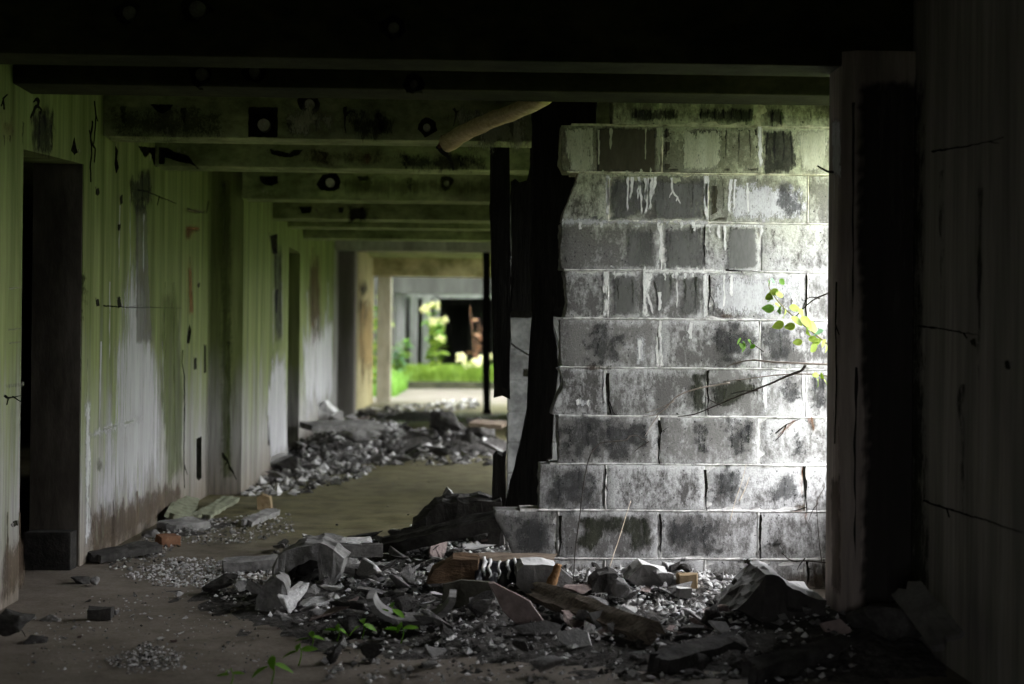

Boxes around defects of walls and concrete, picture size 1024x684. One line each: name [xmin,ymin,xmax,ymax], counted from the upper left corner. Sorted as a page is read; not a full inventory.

leakage [90,170,181,550]
leakage [268,245,288,456]
leakage [302,290,334,421]
leakage [503,80,929,607]
crack [923,500,1022,533]